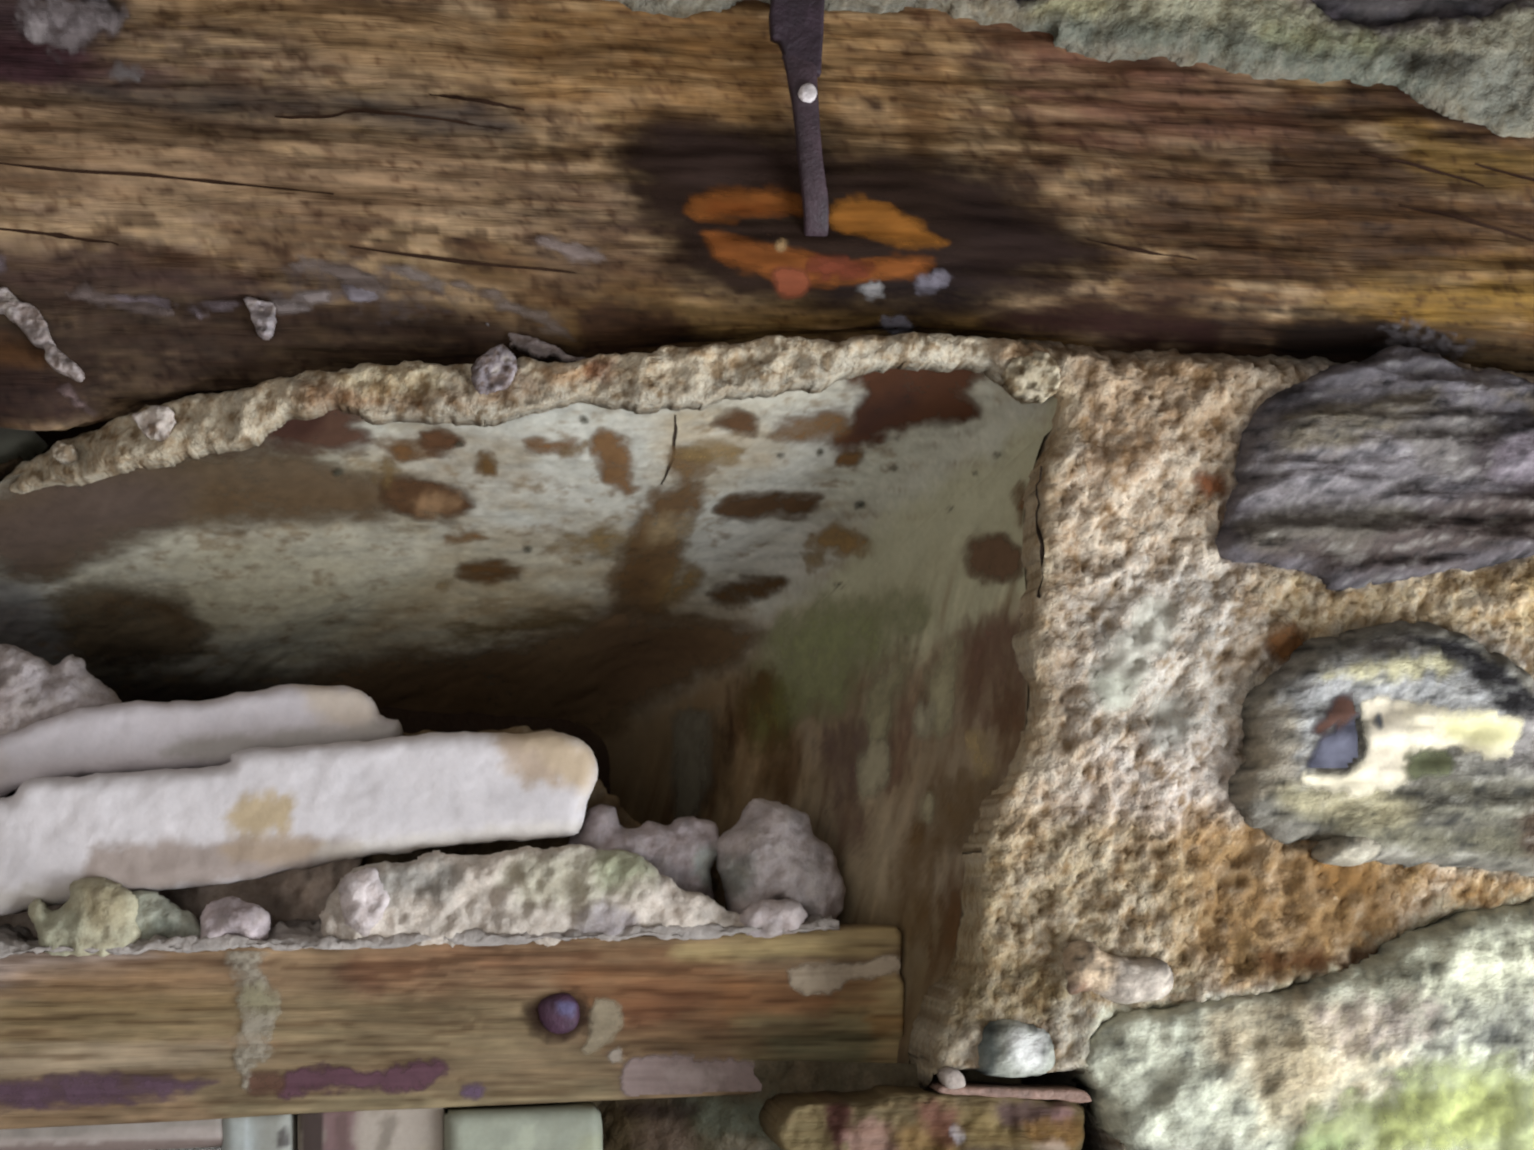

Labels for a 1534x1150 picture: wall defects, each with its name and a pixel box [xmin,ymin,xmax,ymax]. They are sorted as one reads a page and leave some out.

corrosion [685,189,947,299]
water stain [615,120,1218,354]